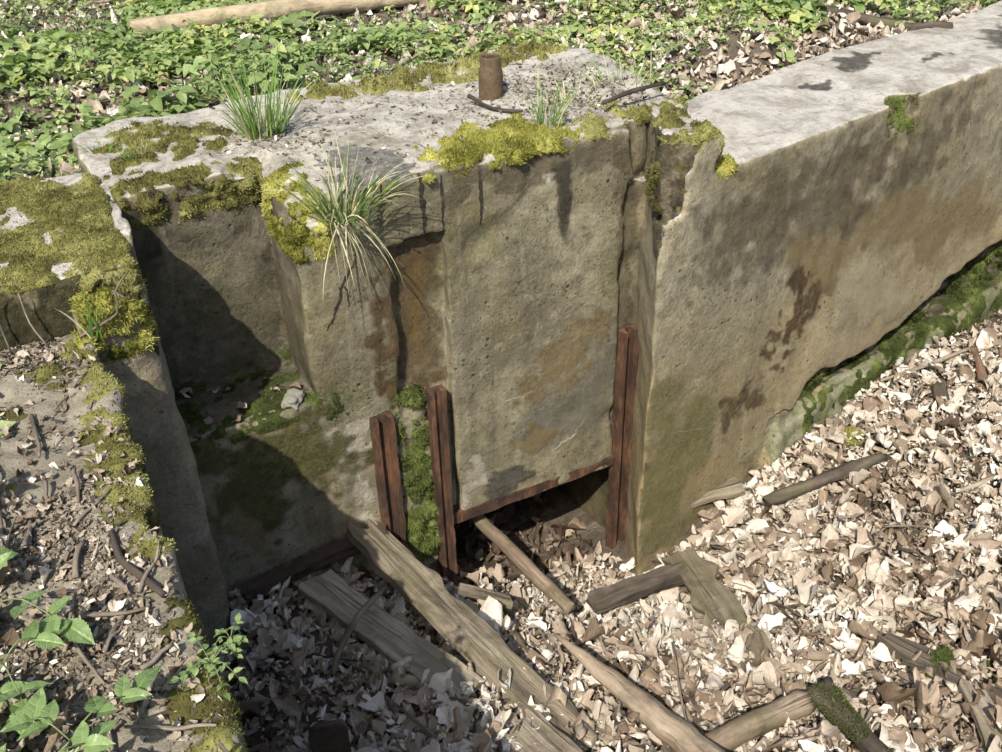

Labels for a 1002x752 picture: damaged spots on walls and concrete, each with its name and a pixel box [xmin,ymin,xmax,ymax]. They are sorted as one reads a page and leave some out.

damp [443,124,636,254]
spalling [644,125,714,261]
corrosion [366,234,447,399]